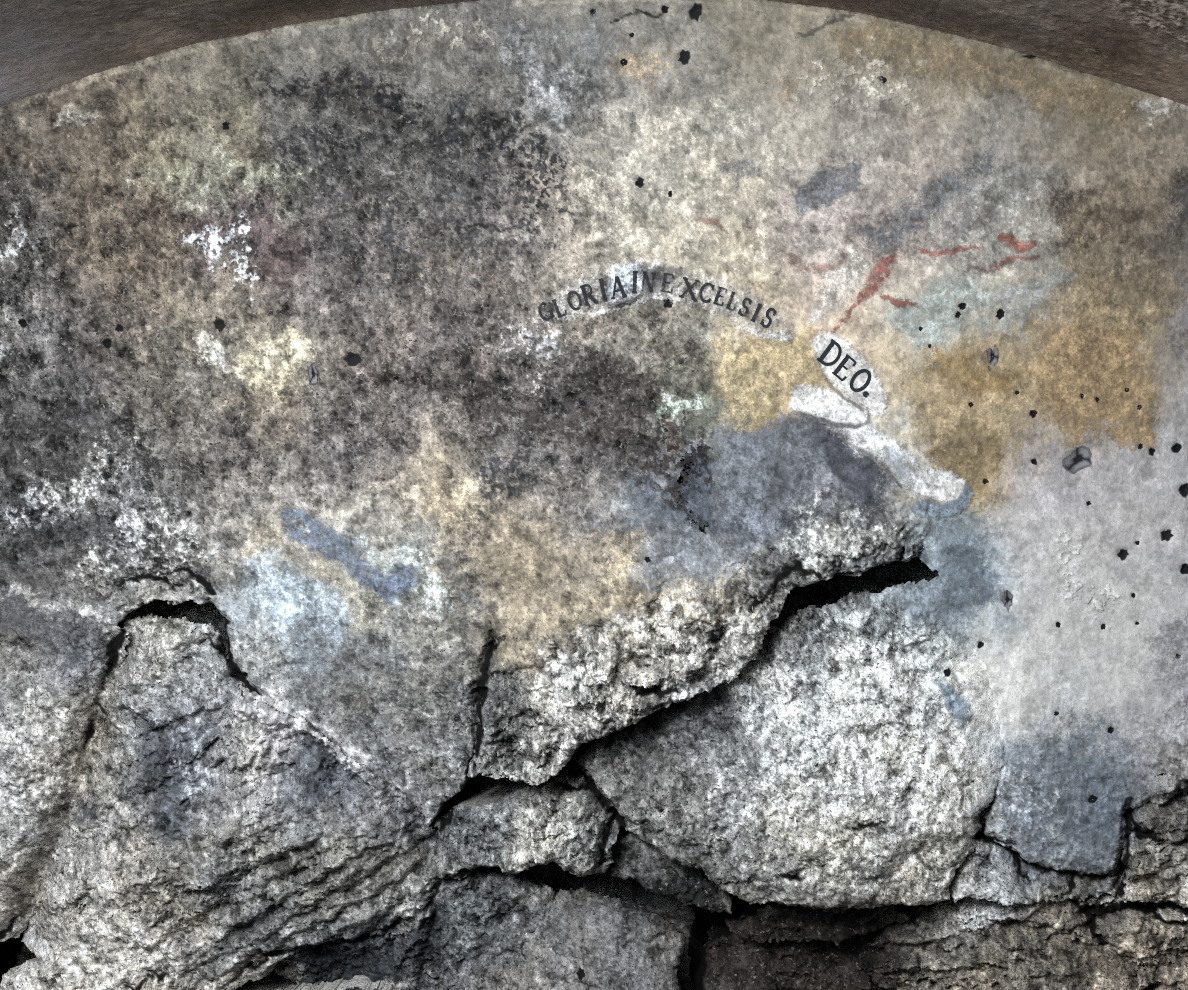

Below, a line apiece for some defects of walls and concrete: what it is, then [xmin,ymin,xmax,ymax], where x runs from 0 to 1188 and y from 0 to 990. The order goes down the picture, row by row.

damp [169,62,589,303]
crack [83,566,263,750]
peeling [155,713,219,821]
peeling [236,695,368,789]
crack [438,632,505,832]
crack [555,743,626,870]
peeling [533,575,763,749]
crack [621,681,682,701]
spalling [1001,590,1013,610]
peeling [983,744,1063,843]
crack [974,800,1188,944]
crack [0,917,23,983]